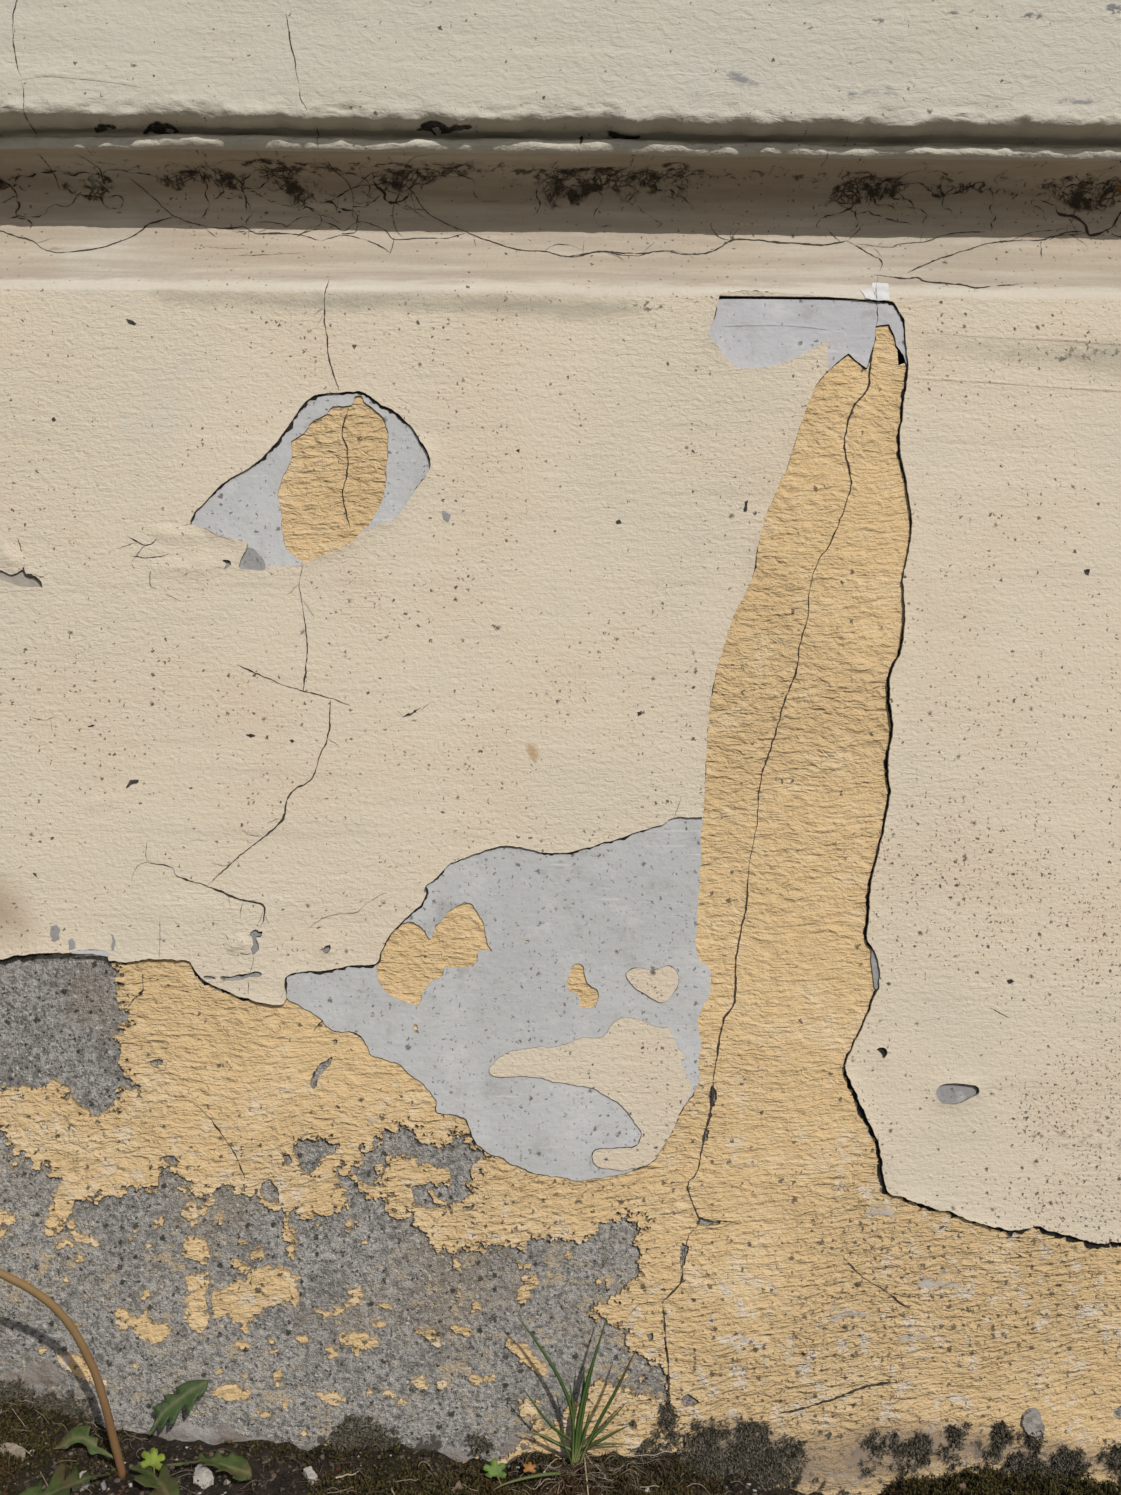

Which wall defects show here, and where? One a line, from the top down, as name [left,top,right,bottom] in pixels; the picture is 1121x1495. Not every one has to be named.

leakage [0,156,501,236]
crack [0,127,1121,334]
leakage [534,160,711,228]
leakage [816,160,1121,245]
peeling [0,570,41,587]
peeling [191,391,431,570]
crack [319,279,350,528]
crack [132,566,351,989]
peeling [285,298,912,1183]
crack [628,346,874,1398]
peeling [0,949,1121,1495]
leakage [789,1435,978,1476]